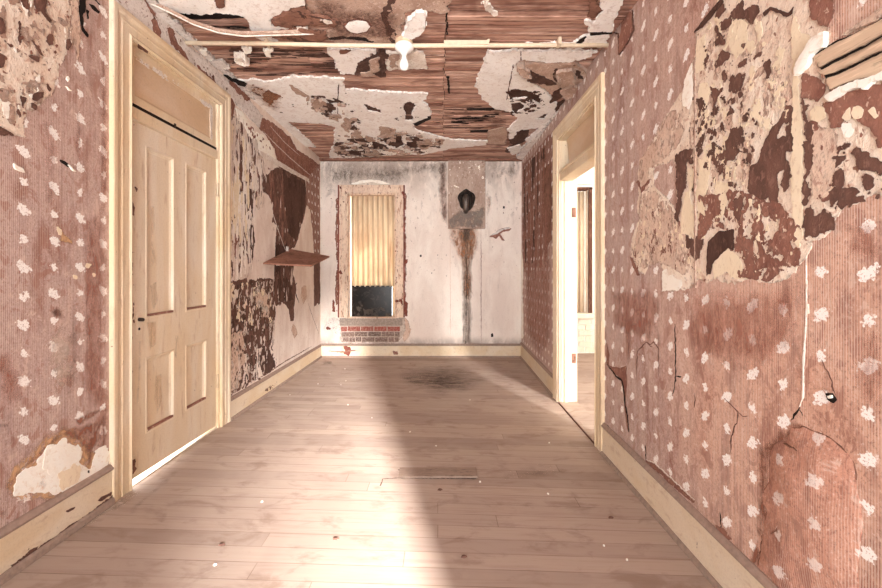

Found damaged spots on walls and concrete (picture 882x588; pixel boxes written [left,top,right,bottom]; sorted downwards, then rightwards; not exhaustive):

peeling [0,17,54,68]
peeling [115,0,635,182]
peeling [703,0,771,117]
spalling [793,7,882,102]
peeling [674,125,746,222]
peeling [800,98,882,238]
flaking render [323,179,411,356]
spalling [13,438,110,496]
peeling [231,280,275,391]
crack [636,328,696,407]
crack [724,398,747,452]
crack [822,361,836,398]